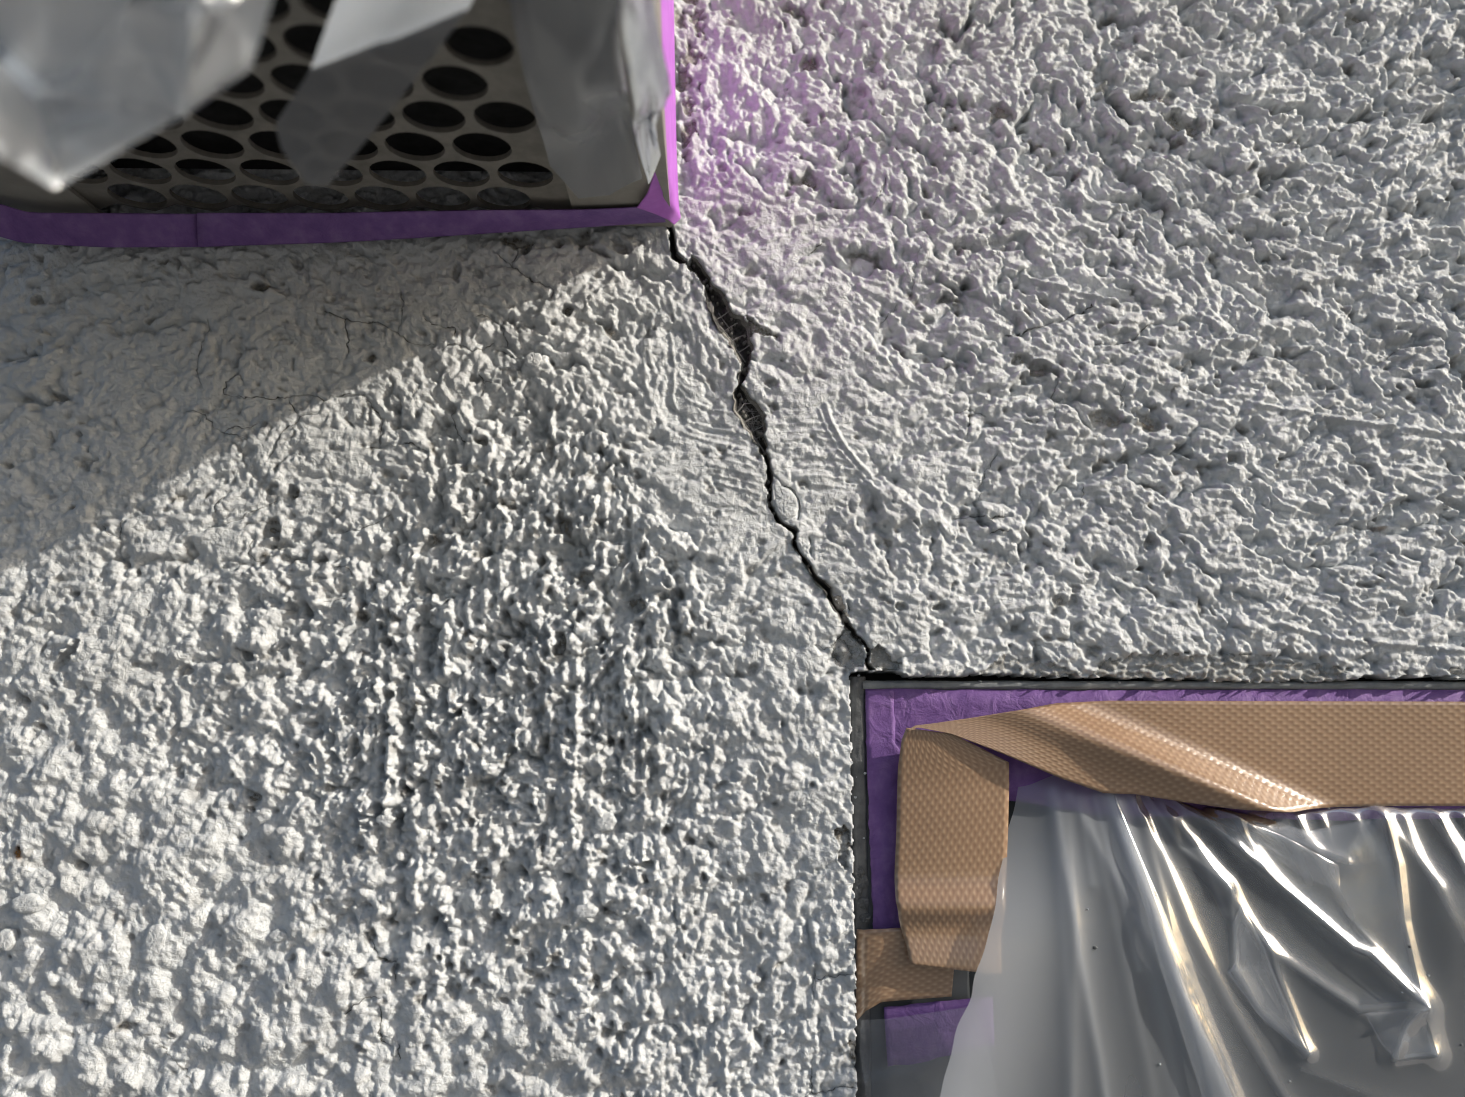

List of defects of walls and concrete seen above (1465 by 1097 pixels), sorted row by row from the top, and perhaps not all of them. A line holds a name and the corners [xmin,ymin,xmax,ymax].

crack [667,227,894,670]